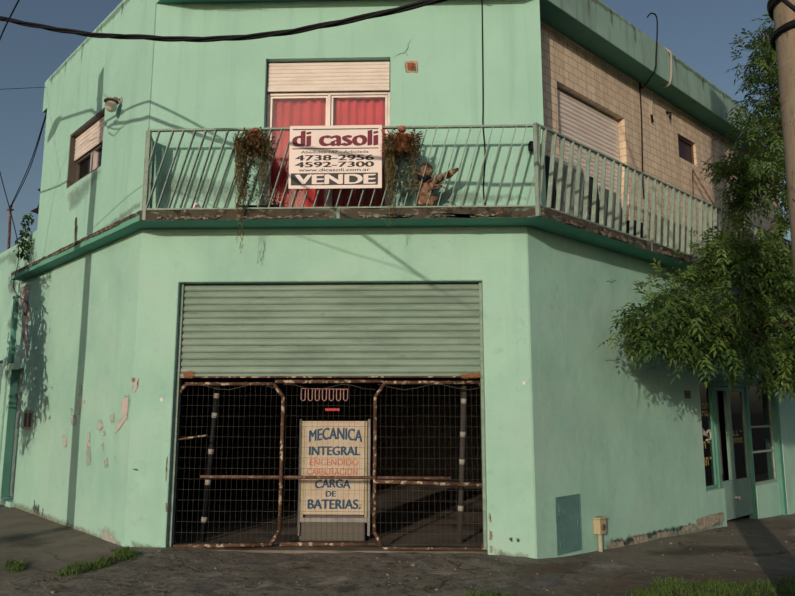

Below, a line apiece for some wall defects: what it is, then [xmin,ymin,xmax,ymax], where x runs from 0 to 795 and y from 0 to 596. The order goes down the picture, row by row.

peeling [18,286,31,359]
peeling [70,386,85,425]
peeling [86,377,139,465]
spalling [696,512,725,530]